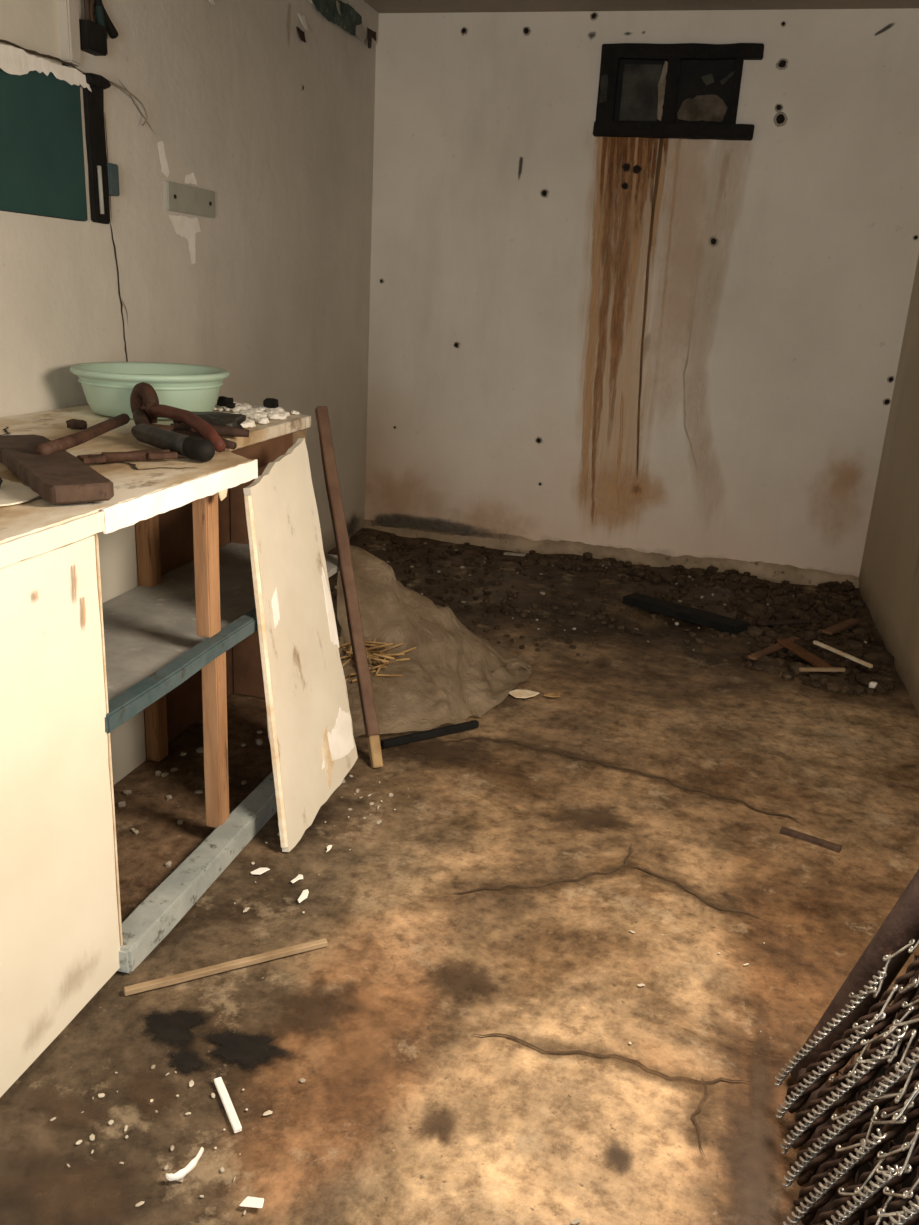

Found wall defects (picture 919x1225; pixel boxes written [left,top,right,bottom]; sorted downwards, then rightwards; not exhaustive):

peeling [296,0,376,49]
flaking render [0,44,92,92]
peeling [158,141,169,178]
peeling [169,215,201,264]
corrosion [582,137,668,521]
crack [421,737,805,825]
crack [454,843,765,919]
crack [475,1033,752,1159]